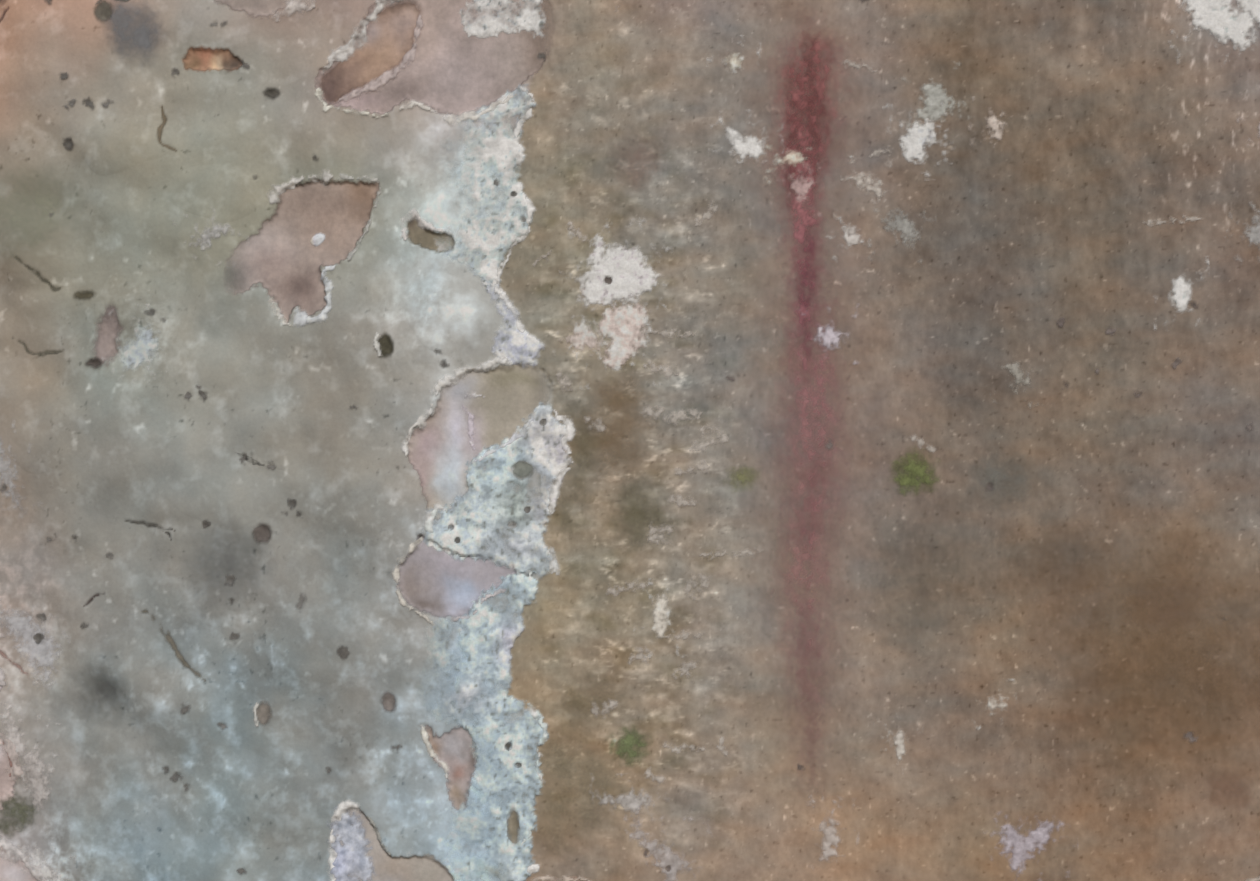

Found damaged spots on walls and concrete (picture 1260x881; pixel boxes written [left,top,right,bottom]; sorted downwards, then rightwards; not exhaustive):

peeling [211,0,315,25]
peeling [1184,0,1260,50]
flaking render [172,47,249,74]
flaking render [233,171,381,326]
peeling [567,225,659,370]
flaking render [315,0,590,881]
peeling [652,594,670,637]
peeling [603,792,687,881]
peeling [1001,822,1053,871]